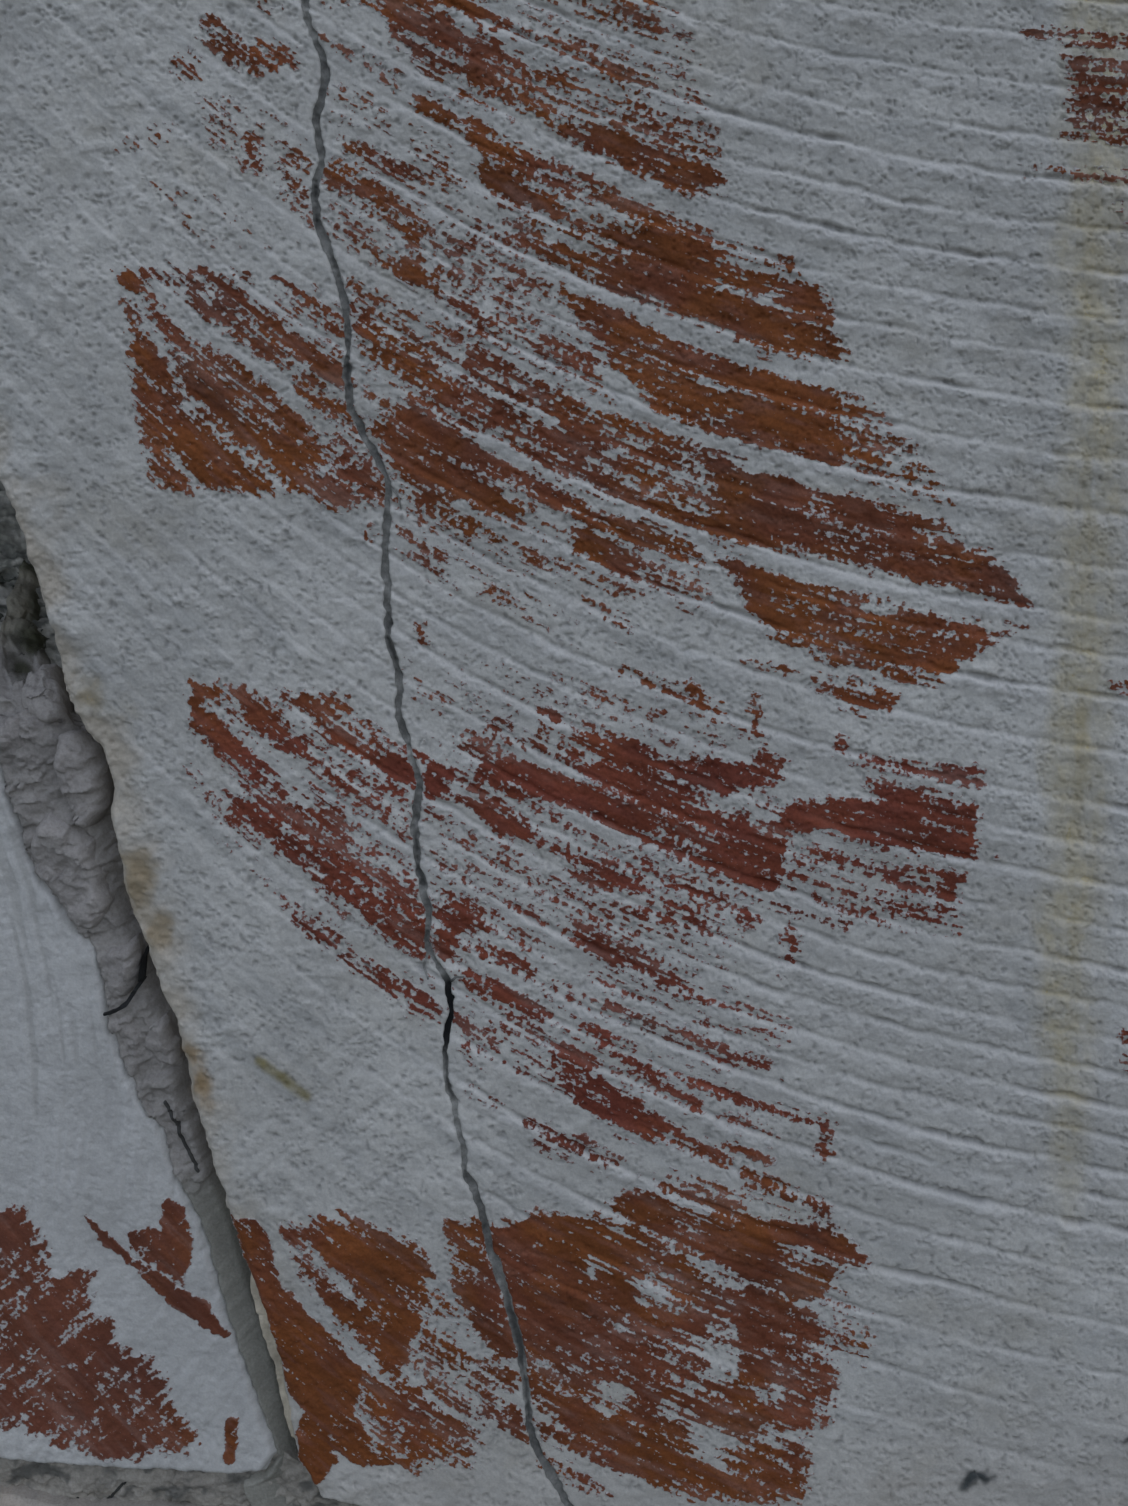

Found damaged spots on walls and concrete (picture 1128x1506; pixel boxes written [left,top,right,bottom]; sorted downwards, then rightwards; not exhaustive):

crack [301,0,574,1506]